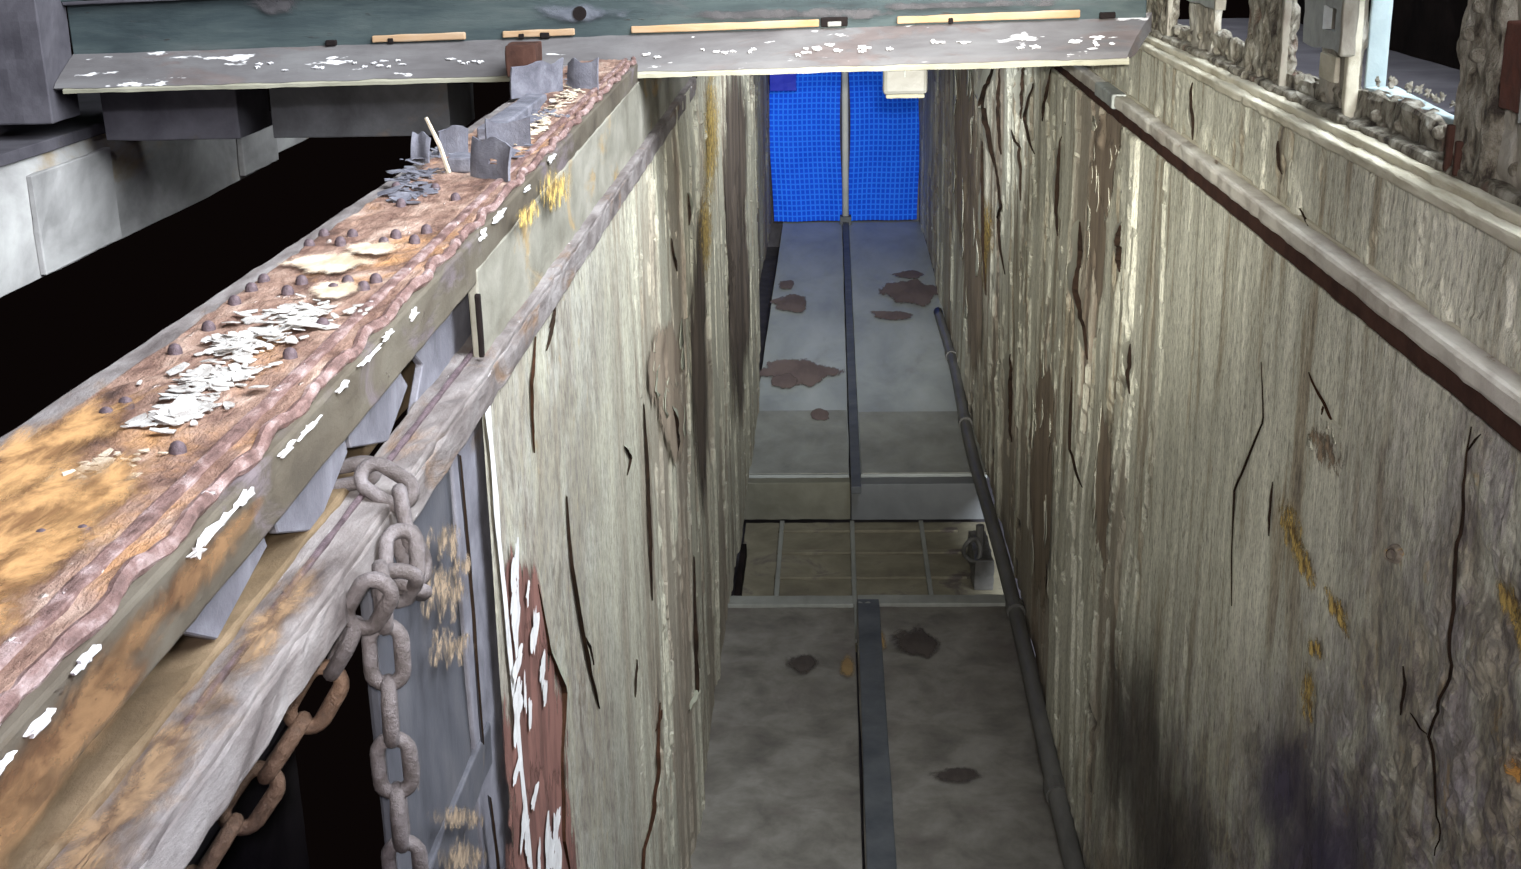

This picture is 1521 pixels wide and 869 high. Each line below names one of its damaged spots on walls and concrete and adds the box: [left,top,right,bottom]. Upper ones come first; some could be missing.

corrosion [517,171,569,228]
corrosion [770,280,806,312]
corrosion [759,358,844,388]
corrosion [871,270,938,320]
crack [975,67,1131,488]
crack [624,403,681,601]
crack [1231,362,1273,606]
peeling [485,406,579,869]
crack [538,496,700,869]
damp [1103,661,1203,869]
damp [1260,748,1372,869]
crack [1399,426,1481,856]